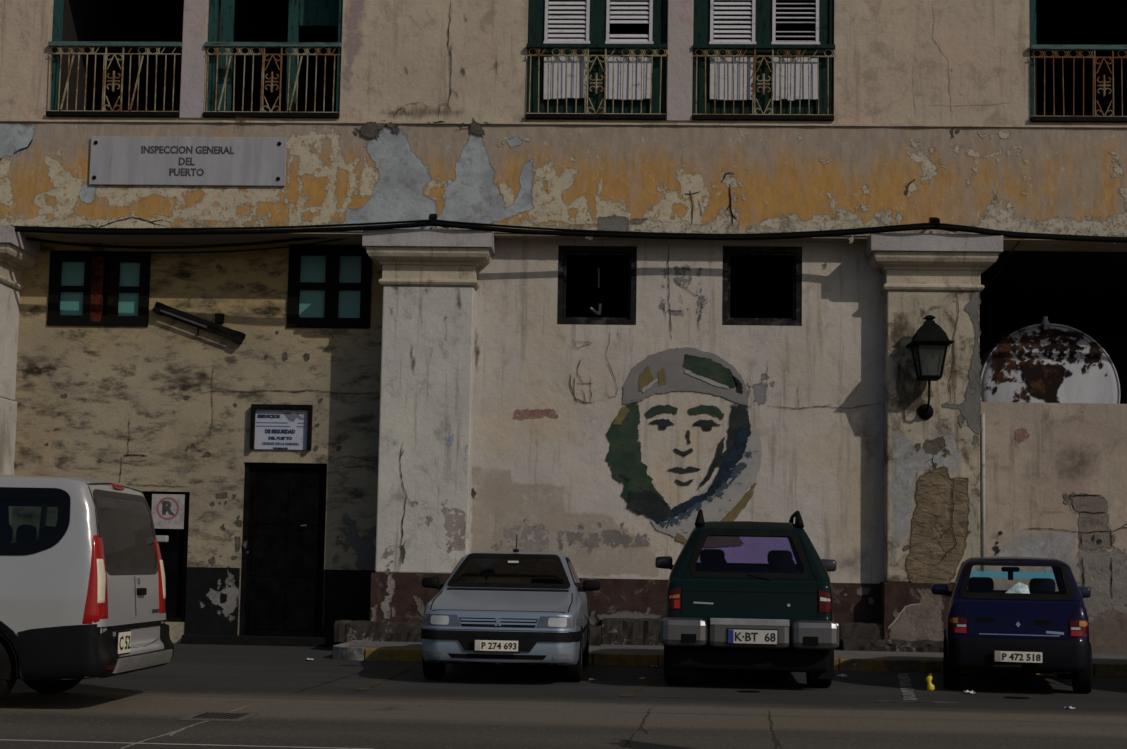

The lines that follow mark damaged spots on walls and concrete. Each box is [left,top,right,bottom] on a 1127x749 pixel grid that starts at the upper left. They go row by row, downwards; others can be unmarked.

peeling [0,125,380,230]
flaking render [354,120,400,138]
flaking render [461,117,485,135]
peeling [496,156,904,243]
peeling [905,128,1127,240]
peeling [200,515,249,622]
crack [331,441,413,566]
flaking render [888,436,972,641]
flaking render [1063,492,1127,625]